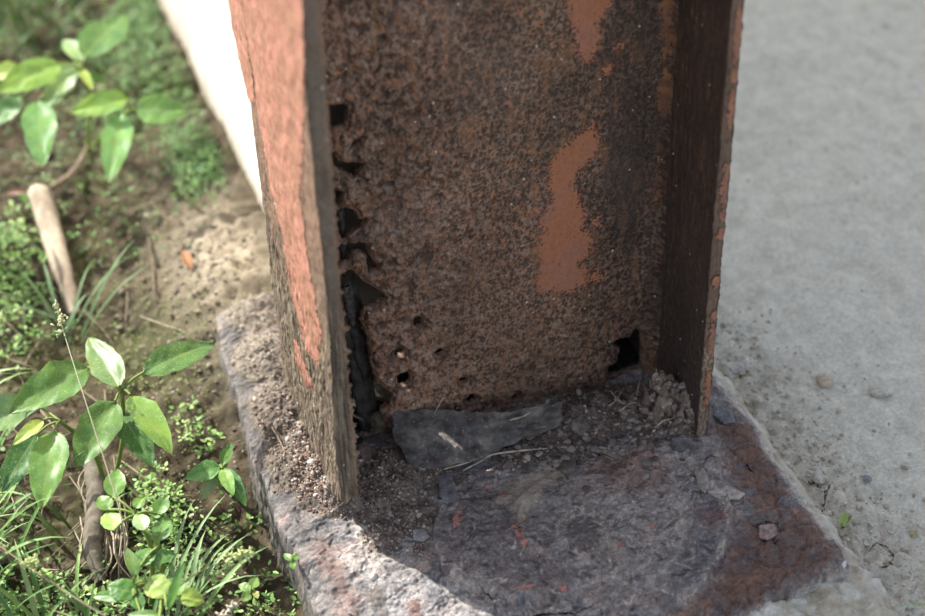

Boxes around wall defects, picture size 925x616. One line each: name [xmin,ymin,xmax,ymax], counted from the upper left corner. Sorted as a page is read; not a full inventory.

corrosion [392,345,408,362]
corrosion [395,371,412,390]
crack [534,601,602,616]